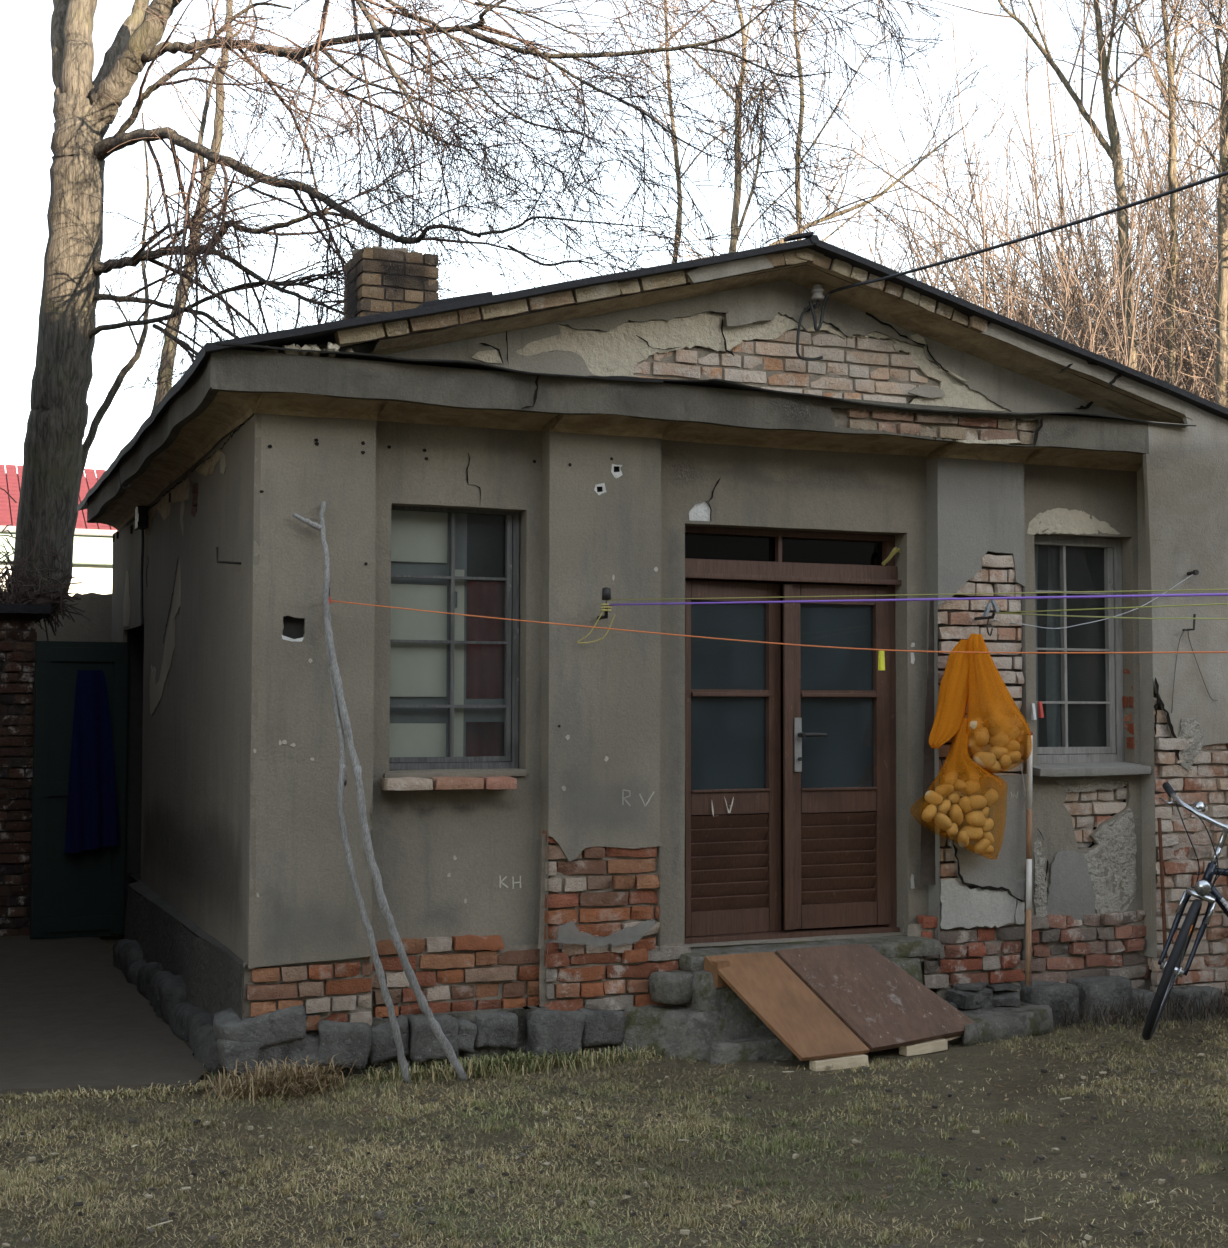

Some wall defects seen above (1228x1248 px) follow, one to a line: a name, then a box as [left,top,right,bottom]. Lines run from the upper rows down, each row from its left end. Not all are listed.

flaking render [471,350,502,364]
flaking render [516,302,1036,446]
crack [829,312,948,372]
crack [466,453,481,501]
flaking render [907,552,1228,1009]
flaking render [241,830,691,1035]